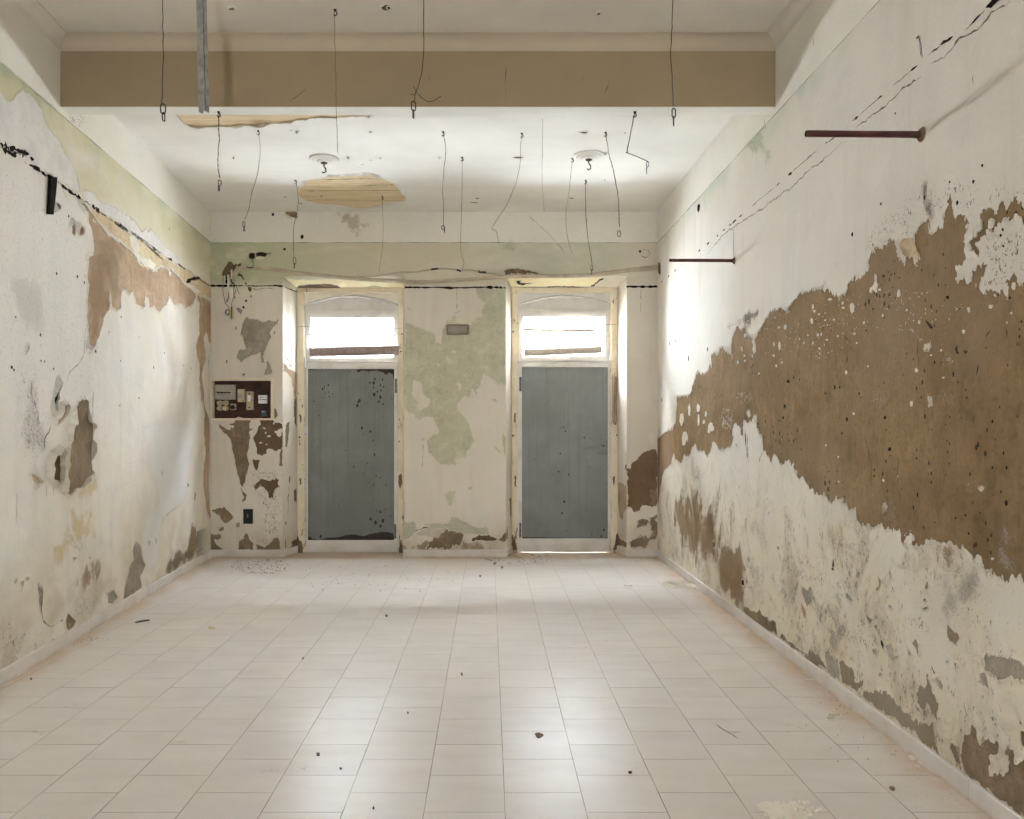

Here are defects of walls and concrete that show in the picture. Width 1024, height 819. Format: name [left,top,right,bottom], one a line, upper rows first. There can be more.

crack [710,2,1009,251]
peeling [0,89,604,550]
peeling [618,189,1024,587]
damp [671,489,763,609]
damp [925,545,991,624]